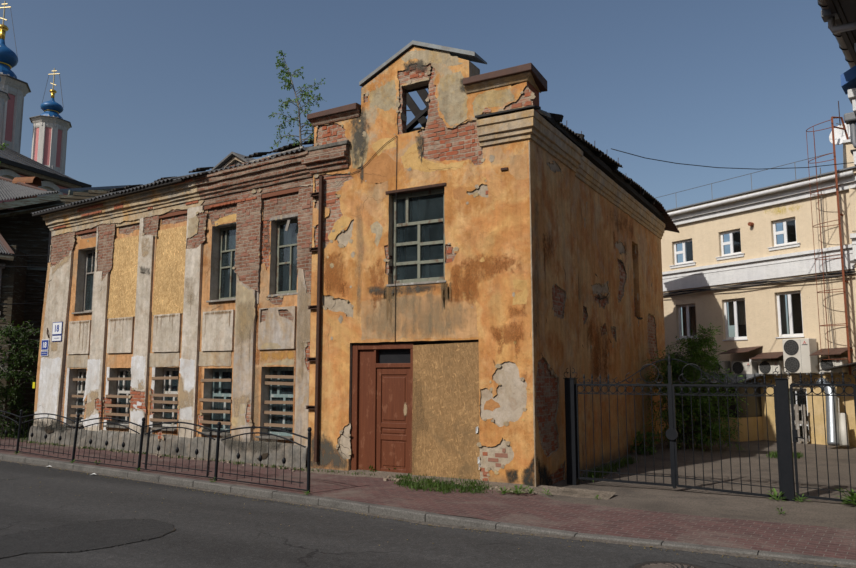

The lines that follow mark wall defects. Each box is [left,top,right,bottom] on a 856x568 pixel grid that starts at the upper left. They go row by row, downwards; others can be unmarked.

flaking render [34,49,536,430]
flaking render [336,423,352,459]
flaking render [477,438,514,481]
flaking render [480,358,558,457]